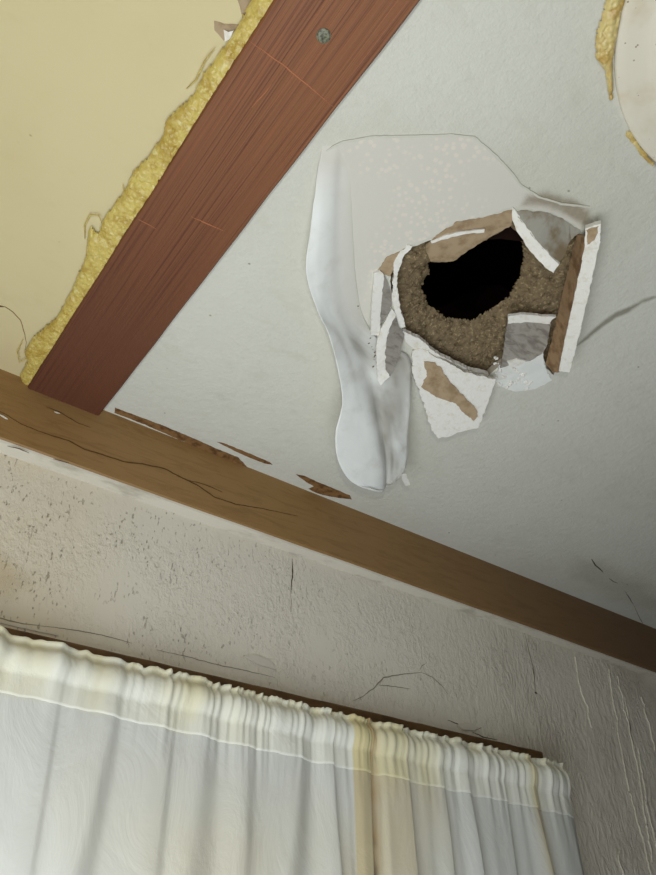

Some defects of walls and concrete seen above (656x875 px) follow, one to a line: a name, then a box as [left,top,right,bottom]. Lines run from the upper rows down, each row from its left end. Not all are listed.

peeling [306,133,590,492]
crack [1,407,296,516]
peeling [114,408,272,467]
peeling [296,474,351,499]
crack [353,663,447,701]